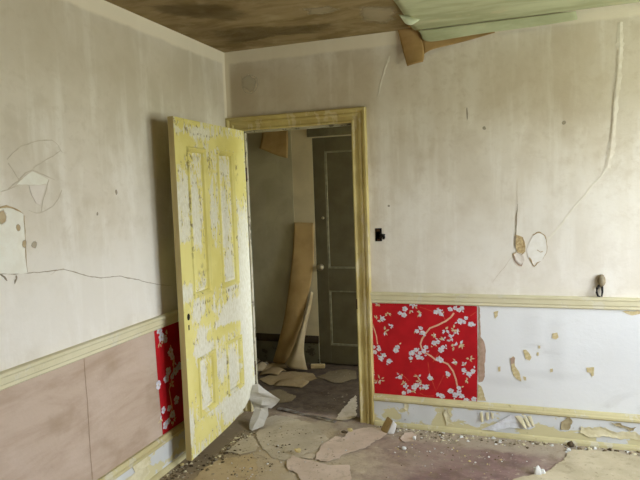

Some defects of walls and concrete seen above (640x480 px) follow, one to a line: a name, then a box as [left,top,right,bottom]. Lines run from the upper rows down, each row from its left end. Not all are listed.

crack [1,140,62,213]
flaking render [0,205,28,274]
flaking render [494,196,547,280]
crack [0,268,171,286]
flaking render [477,306,486,401]
peeling [510,356,526,381]
peeling [478,410,535,431]
peeling [561,417,573,430]
peeling [581,422,640,440]